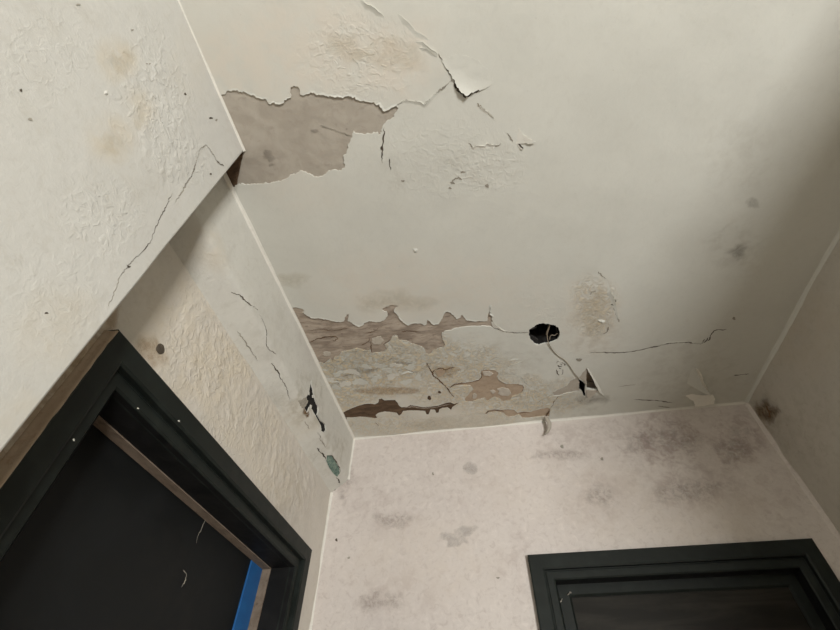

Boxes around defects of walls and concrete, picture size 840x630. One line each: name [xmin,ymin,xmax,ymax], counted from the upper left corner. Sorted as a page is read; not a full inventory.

peeling [398,14,493,98]
peeling [222,86,398,184]
crack [108,146,224,306]
crack [231,292,288,392]
spalling [293,304,494,389]
crack [591,317,735,353]
peeling [343,358,579,435]
peeling [317,448,340,491]